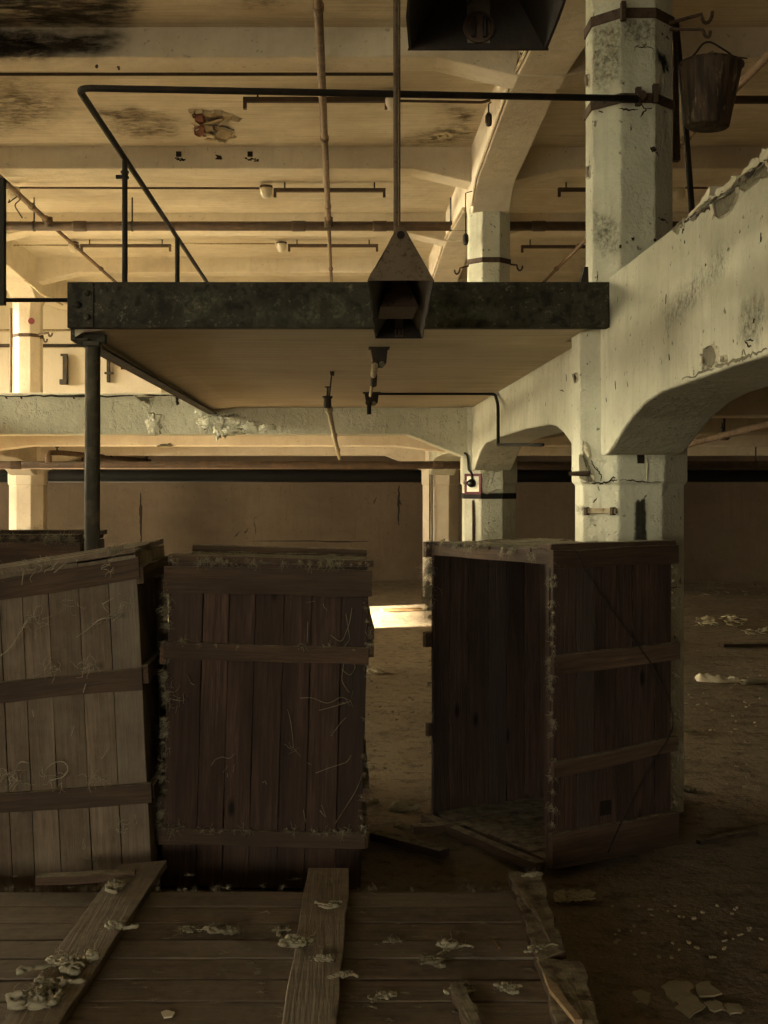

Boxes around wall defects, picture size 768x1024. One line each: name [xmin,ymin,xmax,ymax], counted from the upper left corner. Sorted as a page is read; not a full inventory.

damp [0,0,135,59]
spalling [188,108,243,143]
spalling [671,148,768,244]
crack [682,339,767,380]
crack [583,460,661,503]